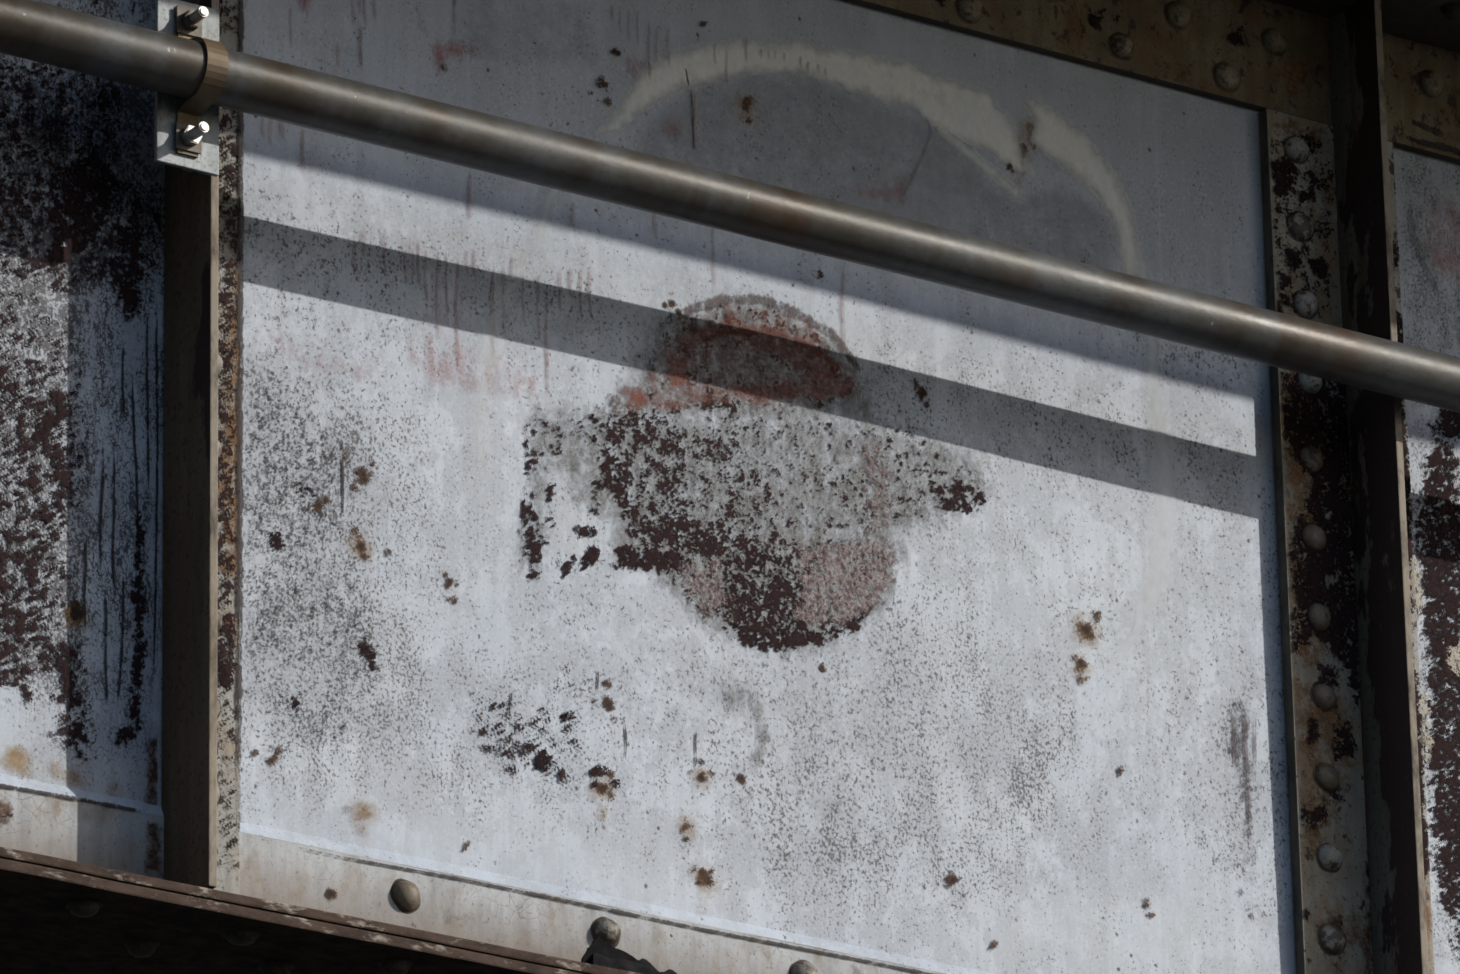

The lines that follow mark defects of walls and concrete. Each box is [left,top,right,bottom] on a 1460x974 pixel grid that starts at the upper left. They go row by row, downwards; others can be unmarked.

corrosion [914,379,930,408]
corrosion [218,322,244,575]
corrosion [67,600,86,623]
corrosion [1078,610,1106,641]
corrosion [1071,655,1090,684]
corrosion [592,679,617,722]
corrosion [596,769,616,800]